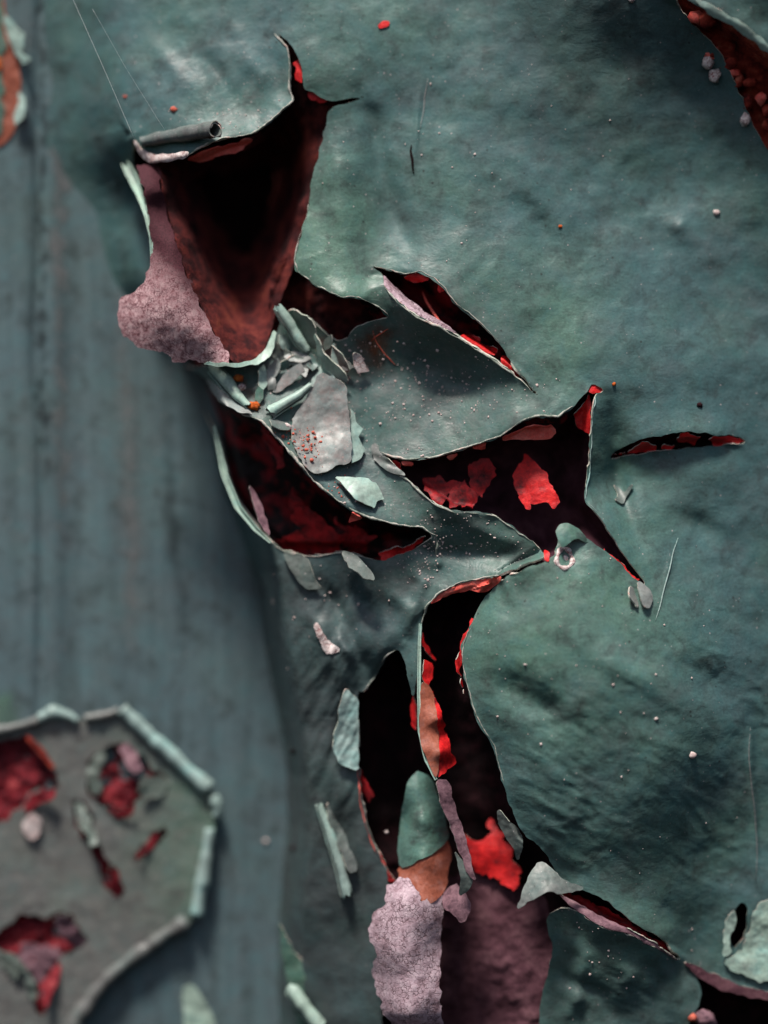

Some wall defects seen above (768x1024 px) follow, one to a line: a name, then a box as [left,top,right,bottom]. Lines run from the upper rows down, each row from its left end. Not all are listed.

spalling [678,0,768,149]
spalling [159,36,369,393]
spalling [374,267,511,363]
spalling [188,359,431,560]
spalling [611,431,743,458]
spalling [332,392,653,886]
peeling [0,734,60,840]
peeling [72,742,170,897]
peeling [0,911,88,1019]
peeling [182,984,215,1024]
spalling [543,892,575,914]
spalling [688,900,768,1024]